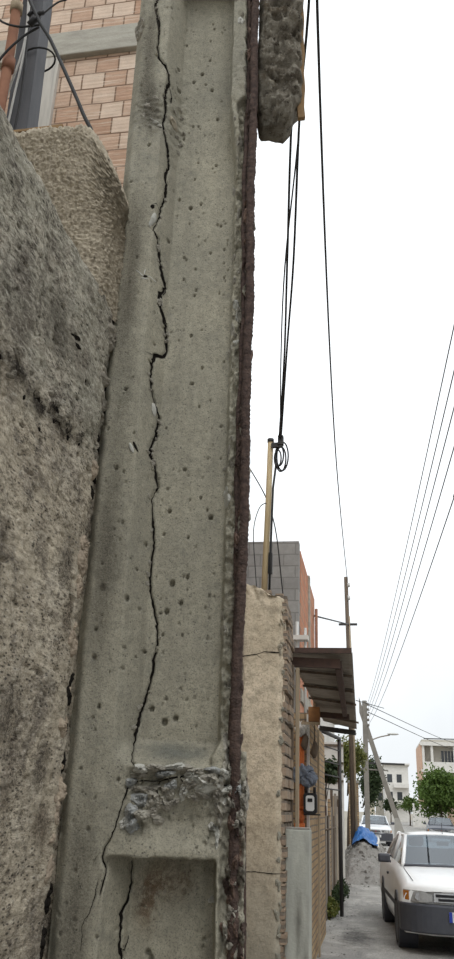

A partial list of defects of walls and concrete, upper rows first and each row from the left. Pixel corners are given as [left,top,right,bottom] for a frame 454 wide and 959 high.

crack [80,0,184,959]
rust [234,407,251,485]
spalling [119,731,250,849]
spalling [208,854,248,959]